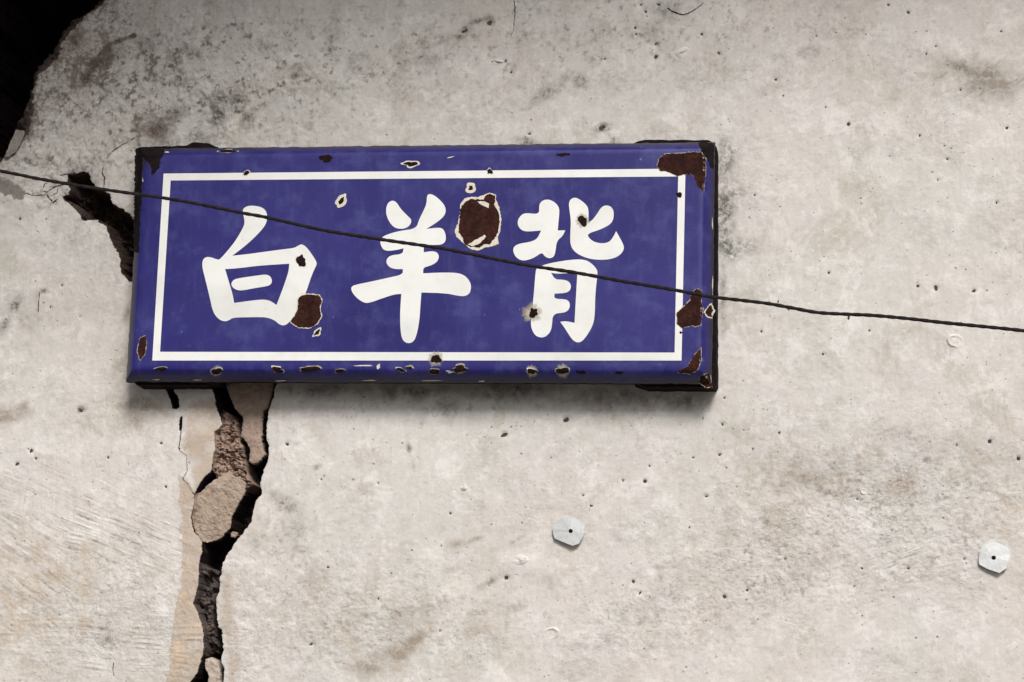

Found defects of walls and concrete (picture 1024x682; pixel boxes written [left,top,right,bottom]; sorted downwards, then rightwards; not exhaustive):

spalling [0,0,105,162]
crack [26,173,77,203]
crack [166,383,277,682]